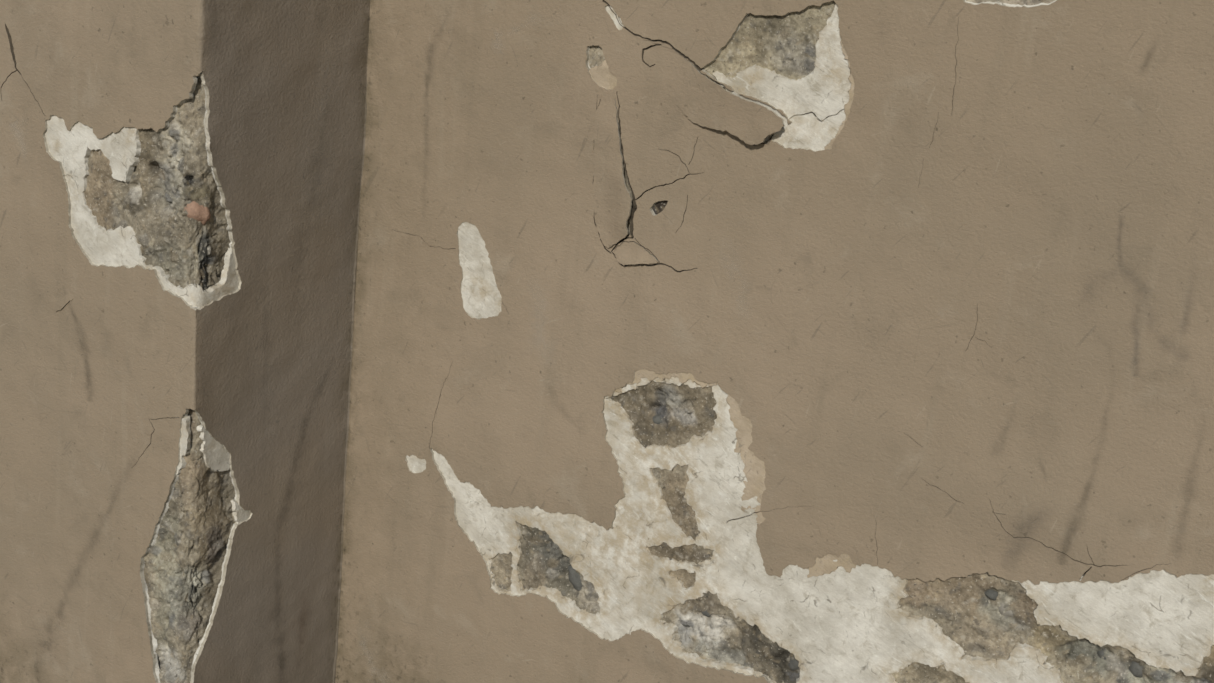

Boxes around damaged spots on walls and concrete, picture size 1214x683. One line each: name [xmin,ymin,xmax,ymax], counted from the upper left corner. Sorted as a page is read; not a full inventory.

crack [603,0,703,71]
spalling [642,1,854,151]
spalling [44,76,240,309]
peeling [458,222,506,319]
crack [594,95,704,272]
spalling [142,409,251,683]
spalling [406,369,1214,683]